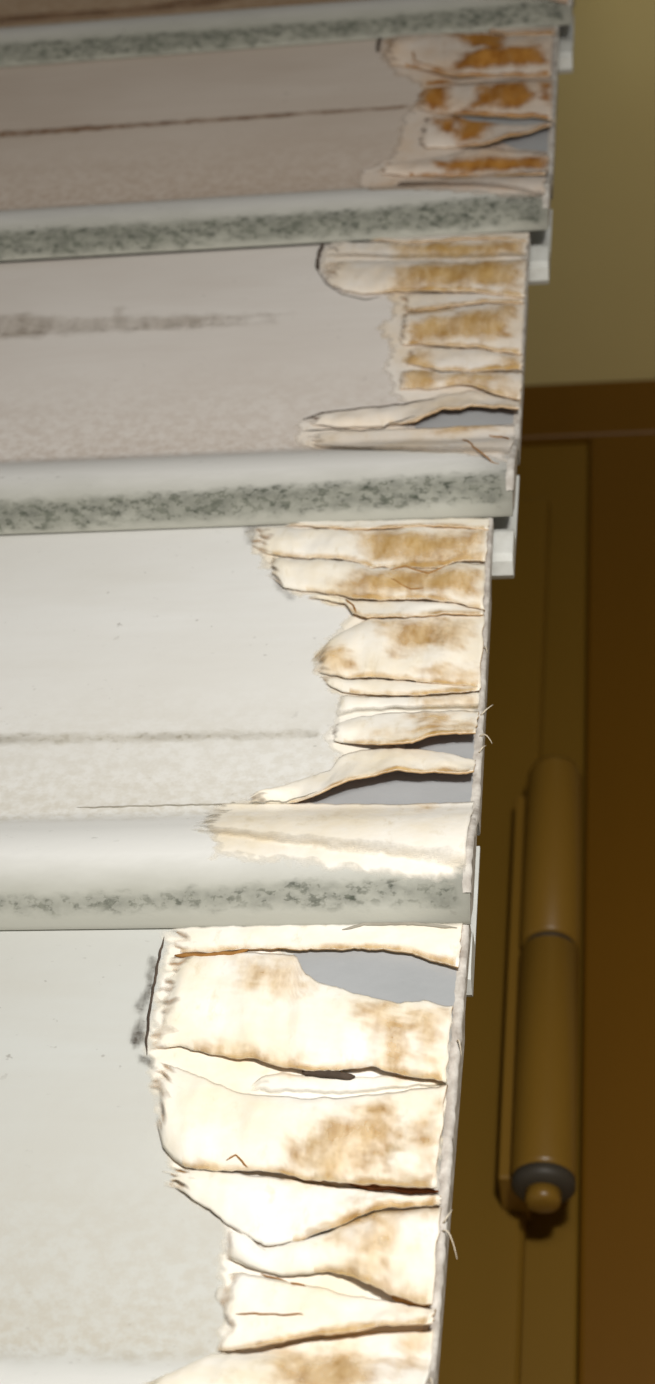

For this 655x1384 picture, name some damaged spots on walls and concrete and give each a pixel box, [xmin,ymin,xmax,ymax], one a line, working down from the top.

peeling [354,26,559,211]
peeling [295,232,530,492]
peeling [202,517,494,895]
peeling [144,923,469,1384]
crack [238,1274,305,1316]